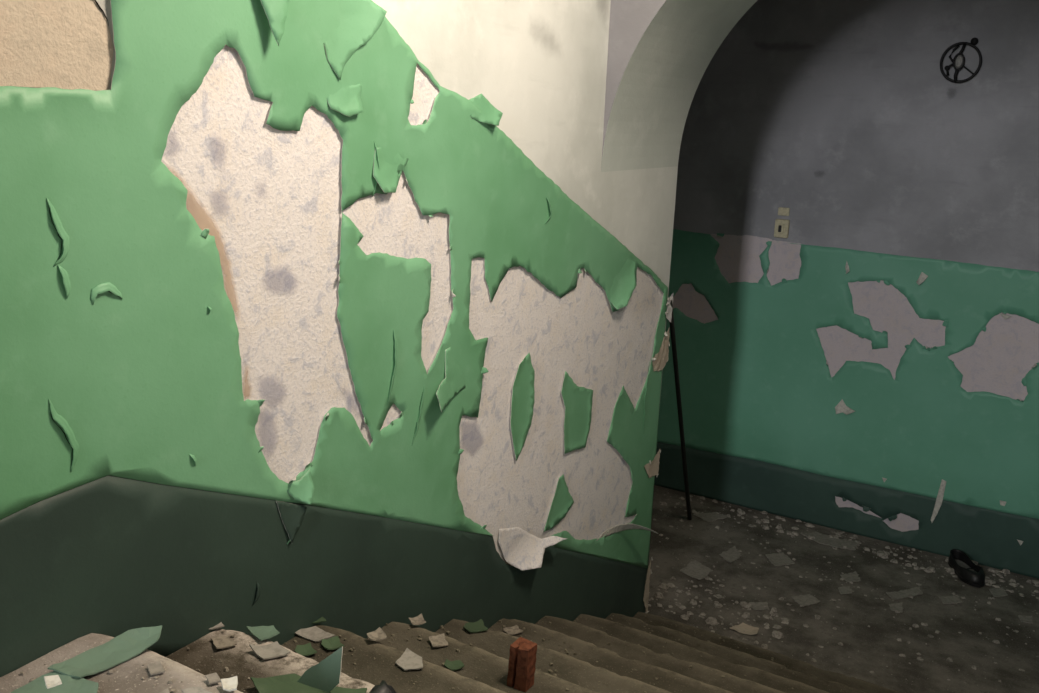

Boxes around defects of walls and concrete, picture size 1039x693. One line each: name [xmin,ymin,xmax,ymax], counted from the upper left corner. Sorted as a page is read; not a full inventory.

flaking render [0,0,113,90]
peeling [469,93,503,126]
peeling [161,0,466,543]
peeling [711,233,801,286]
peeling [816,261,1039,402]
peeling [457,257,718,571]
peeling [835,479,946,532]